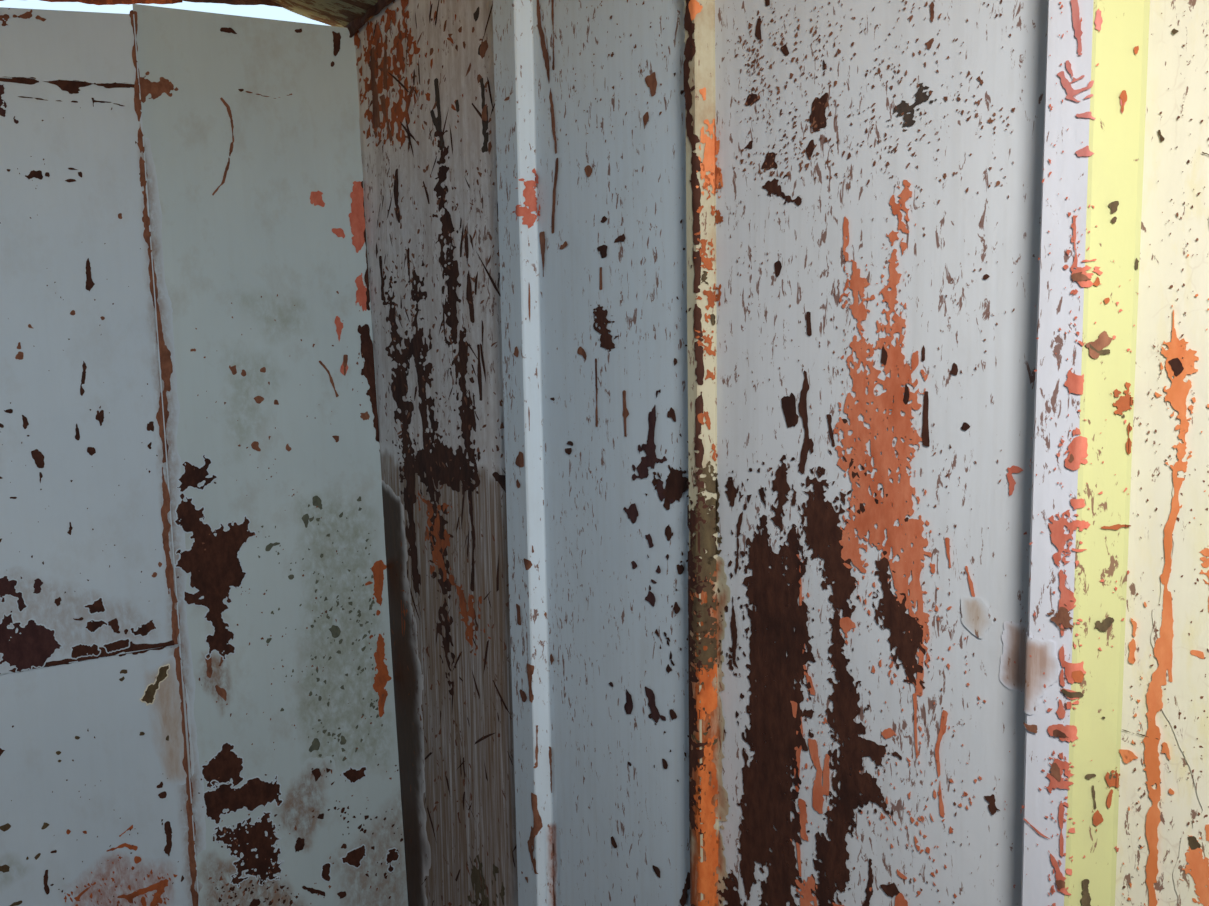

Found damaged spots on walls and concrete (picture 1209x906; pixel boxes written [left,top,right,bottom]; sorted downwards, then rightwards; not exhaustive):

rust [138,71,179,103]
peeling [758,152,802,206]
peeling [0,8,305,906]
rust [0,137,331,906]
rust [545,821,559,906]
peeling [609,682,677,733]
rust [680,0,730,906]
peeling [623,180,939,906]
peeling [1023,498,1131,741]
peeling [1024,695,1151,906]
peeling [1110,382,1134,454]
crack [1187,836,1201,850]